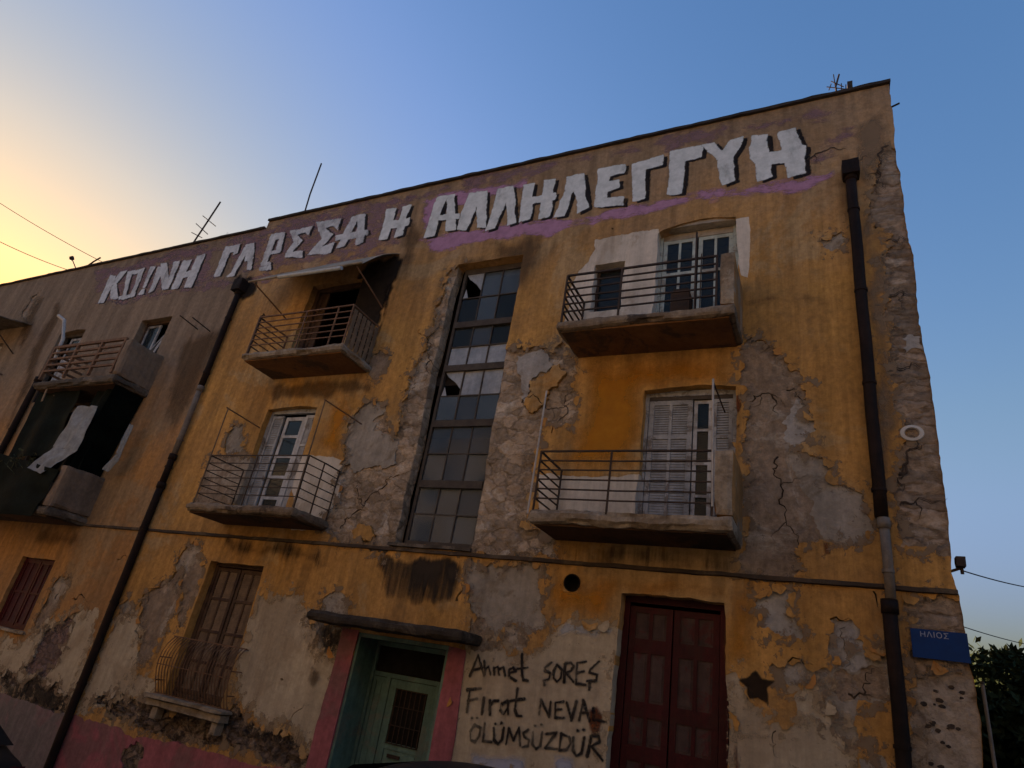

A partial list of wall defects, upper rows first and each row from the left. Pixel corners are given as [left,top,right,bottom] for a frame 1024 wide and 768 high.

peeling [0,538,357,768]
peeling [192,420,255,505]
flaking render [291,257,468,565]
water stain [380,556,460,602]
peeling [446,334,641,768]
crack [773,456,806,576]
flaking render [722,141,983,768]